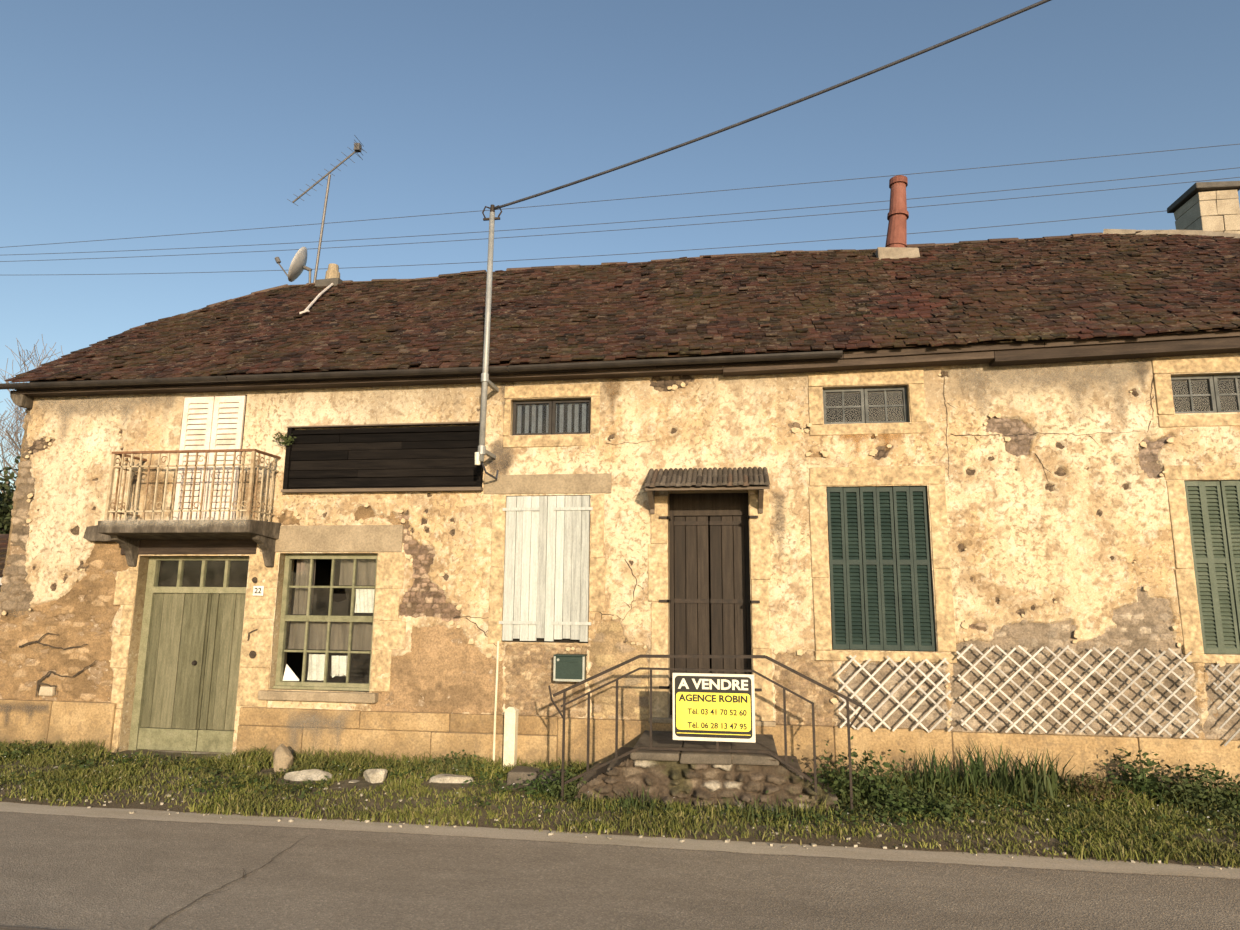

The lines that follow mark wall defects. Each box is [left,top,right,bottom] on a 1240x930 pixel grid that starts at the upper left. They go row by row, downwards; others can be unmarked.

spalling [25,437,55,458]
spalling [983,411,1035,471]
spalling [1138,434,1174,479]
spalling [50,561,89,591]
peeling [354,493,506,714]
spalling [961,618,987,641]